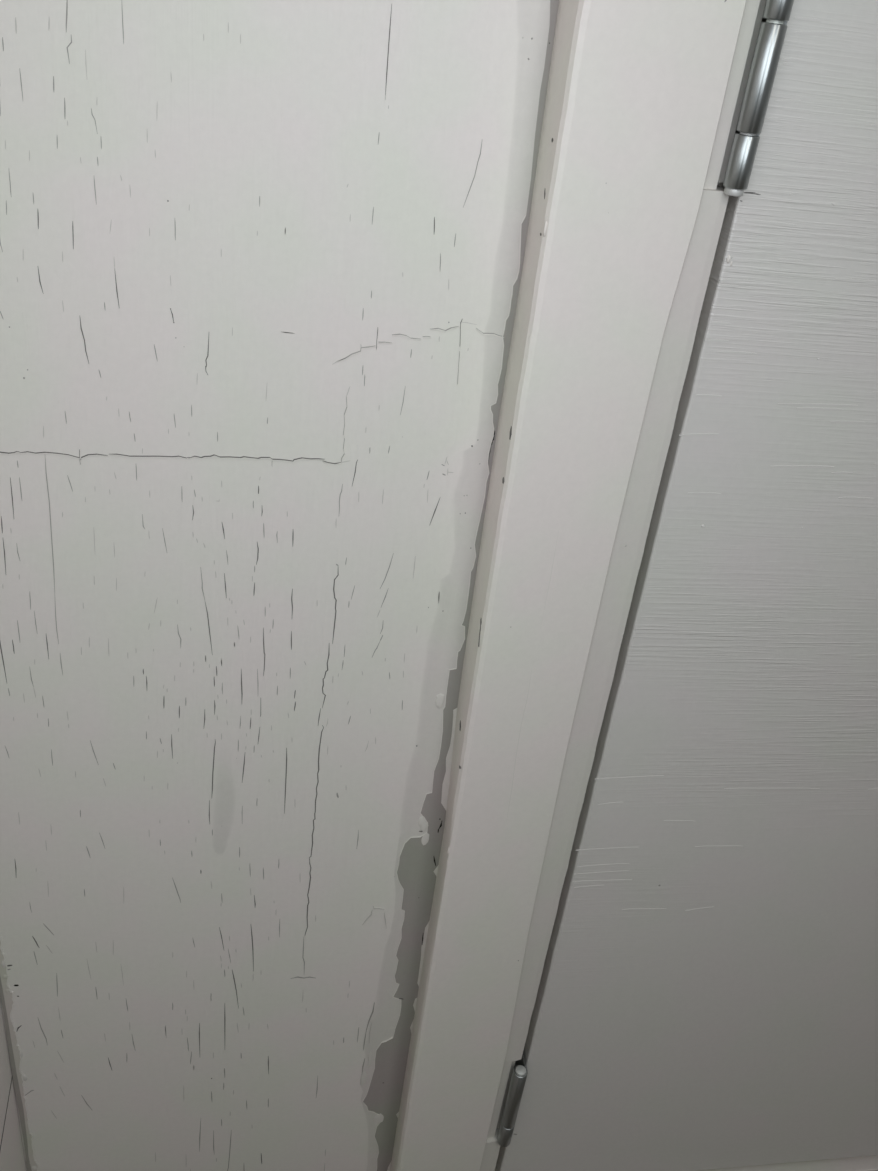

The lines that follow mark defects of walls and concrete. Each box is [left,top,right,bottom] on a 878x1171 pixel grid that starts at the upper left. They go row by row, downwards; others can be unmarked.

crack [0,0,504,1171]
peeling [360,0,559,1171]